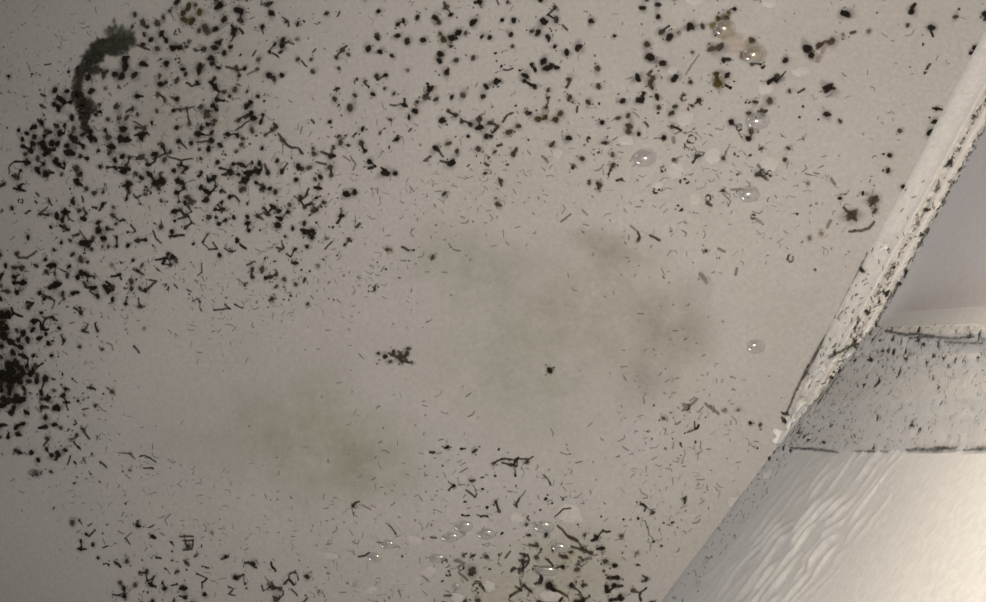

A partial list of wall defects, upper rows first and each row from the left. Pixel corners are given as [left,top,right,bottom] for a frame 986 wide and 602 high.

damp [767,50,805,93]
damp [803,3,856,58]
damp [0,0,742,491]
damp [684,97,986,592]
damp [70,486,224,602]
damp [223,558,325,602]
damp [448,448,534,518]
damp [433,469,686,602]